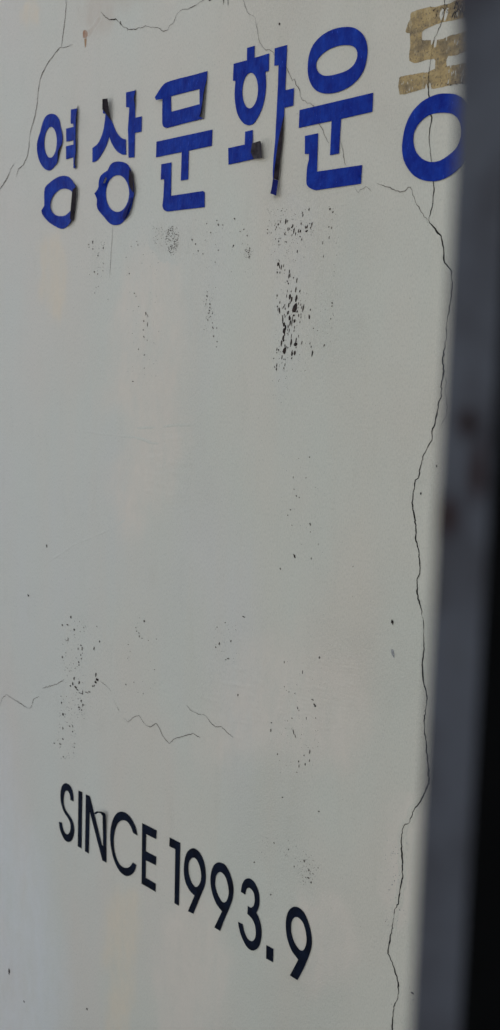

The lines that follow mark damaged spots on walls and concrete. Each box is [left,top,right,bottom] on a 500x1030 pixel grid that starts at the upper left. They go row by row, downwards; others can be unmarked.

crack [0,10,68,189]
crack [101,0,203,31]
crack [355,0,450,1030]
crack [104,684,234,743]